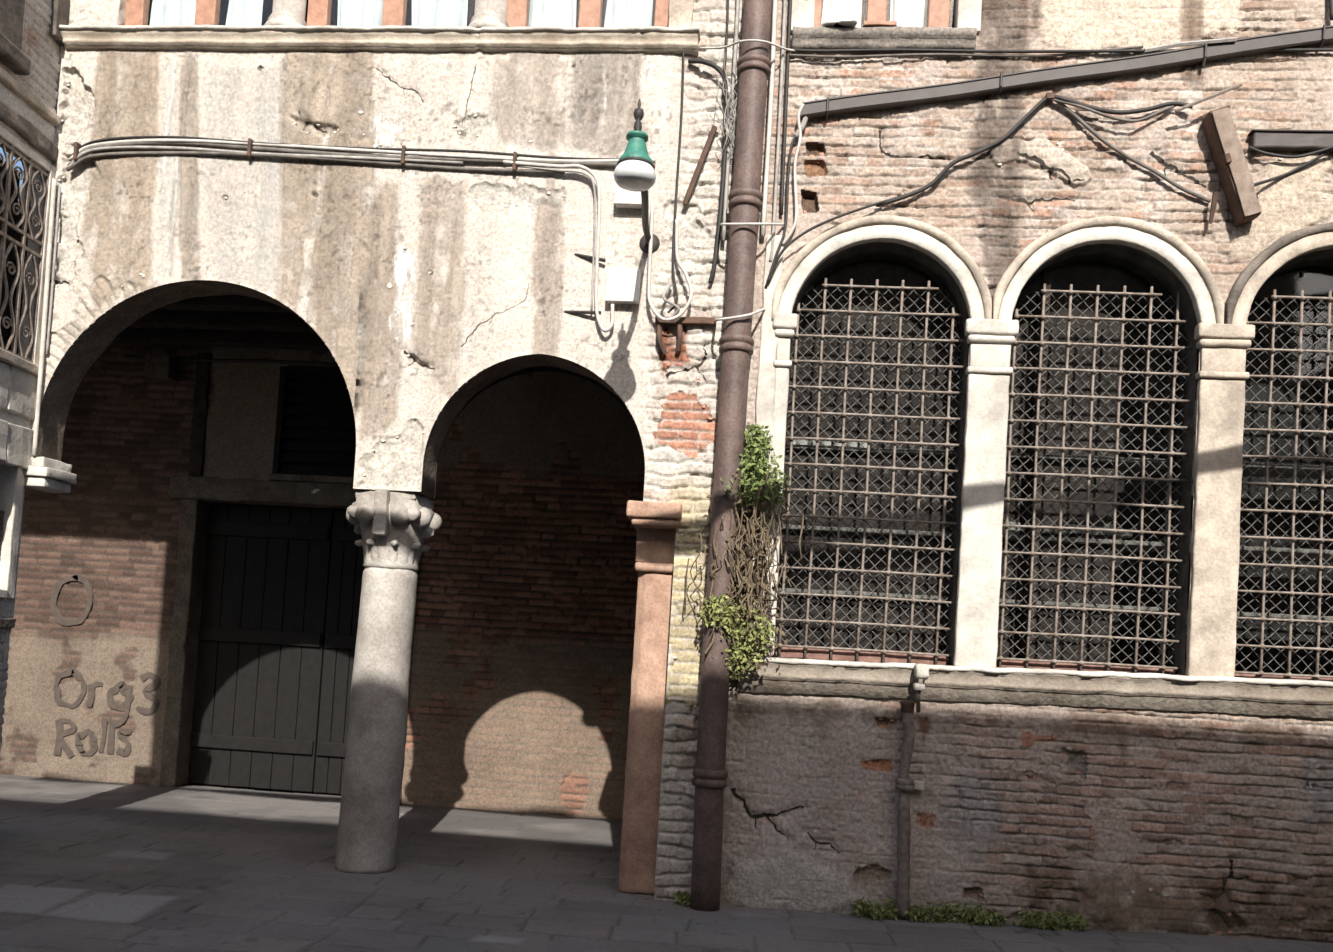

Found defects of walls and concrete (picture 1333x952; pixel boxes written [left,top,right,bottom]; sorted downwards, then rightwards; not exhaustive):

flaking render [44,67,150,389]
water stain [84,49,243,307]
water stain [218,50,399,437]
flaking render [357,418,425,492]
water stain [416,178,465,393]
flaking render [658,345,690,372]
flaking render [653,379,717,458]
crack [730,788,840,853]